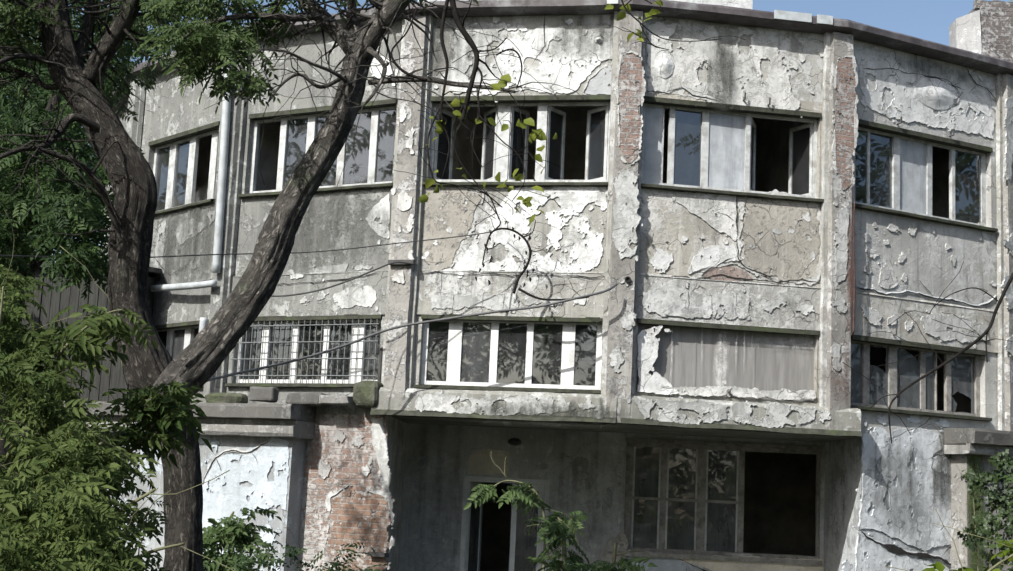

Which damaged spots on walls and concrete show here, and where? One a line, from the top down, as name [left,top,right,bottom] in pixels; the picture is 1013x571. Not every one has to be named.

peeling [360,16,805,279]
peeling [830,46,1013,313]
peeling [286,255,379,315]
peeling [391,270,405,284]
peeling [425,288,586,314]
spalling [619,189,831,428]
crack [671,196,817,316]
peeling [861,305,989,348]
peeling [408,390,602,419]
peeling [202,437,290,571]
spalling [322,417,396,571]
crack [858,529,951,566]